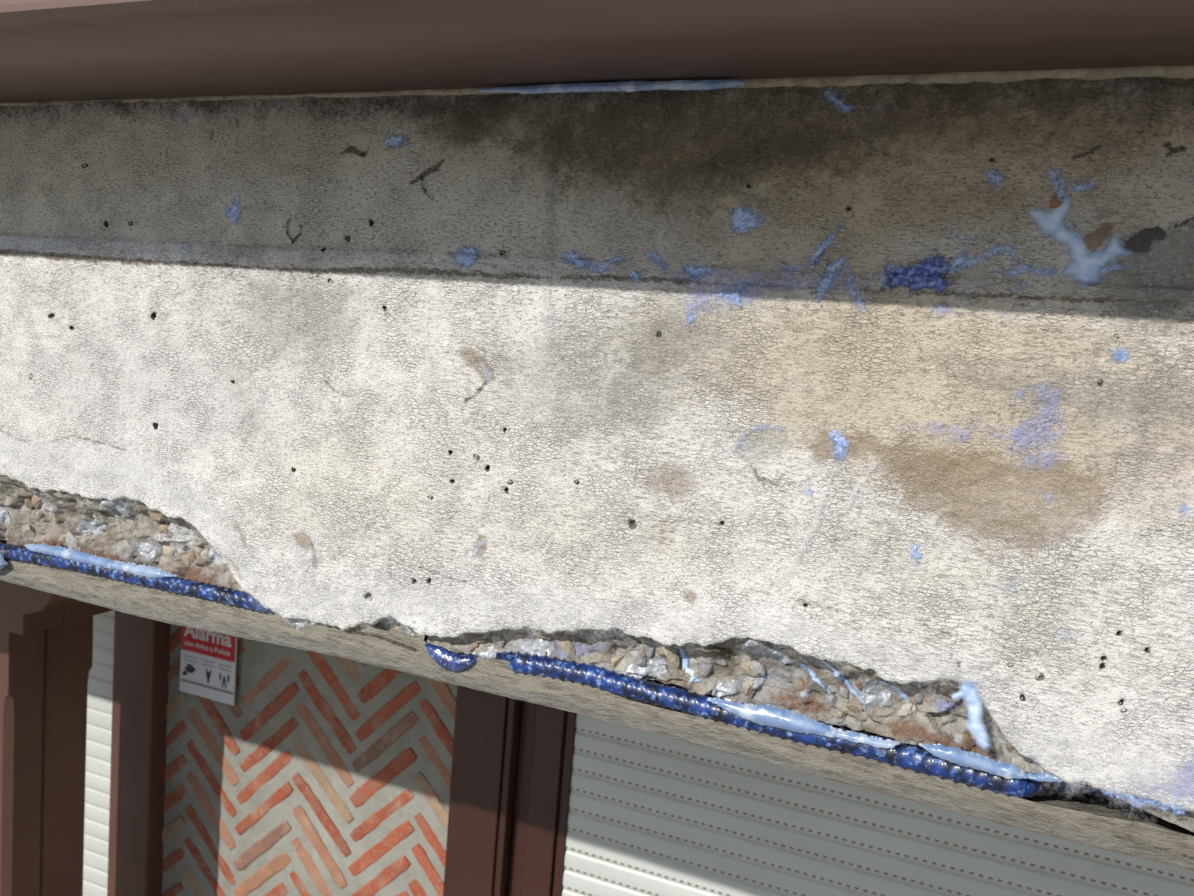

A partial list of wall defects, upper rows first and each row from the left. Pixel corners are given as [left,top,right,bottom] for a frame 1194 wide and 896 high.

damp [362,77,1194,204]
spalling [0,475,244,591]
spalling [284,619,315,629]
spalling [373,617,1045,774]
spalling [1080,781,1194,832]